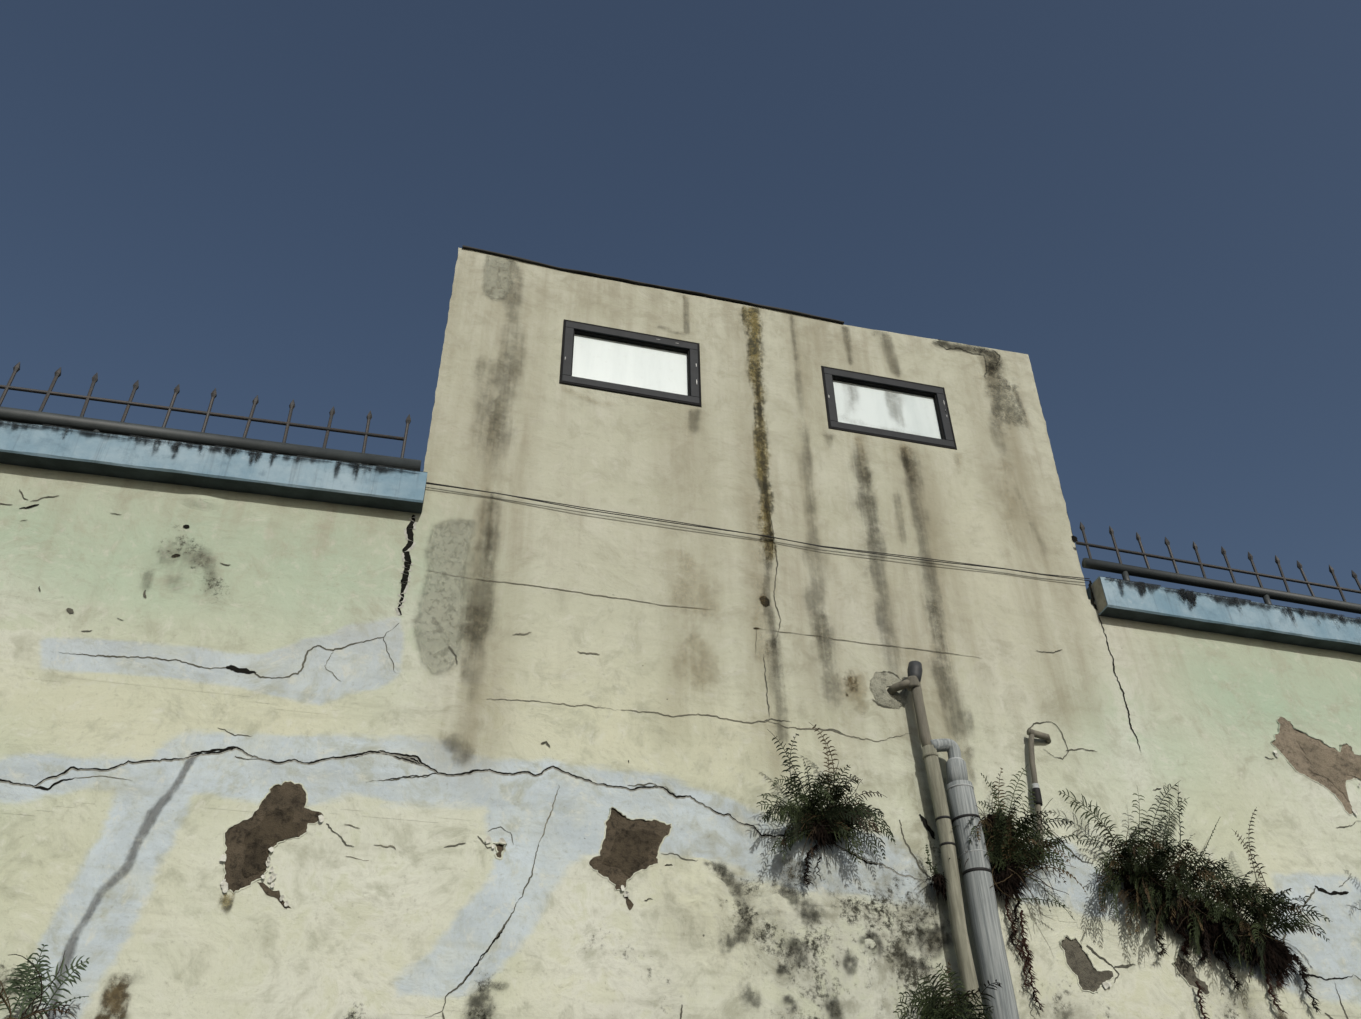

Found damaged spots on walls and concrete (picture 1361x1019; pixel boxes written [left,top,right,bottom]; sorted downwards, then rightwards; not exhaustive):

damp [742,306,776,559]
crack [38,515,713,679]
crack [1072,536,1141,751]
spalling [1270,716,1361,816]
spalling [220,780,325,908]
crack [0,728,935,1019]
spalling [588,807,673,910]
damp [780,884,819,921]
mould [827,998,841,1019]
mould [862,926,948,969]
spalling [1059,935,1115,994]
crack [1283,878,1361,1019]